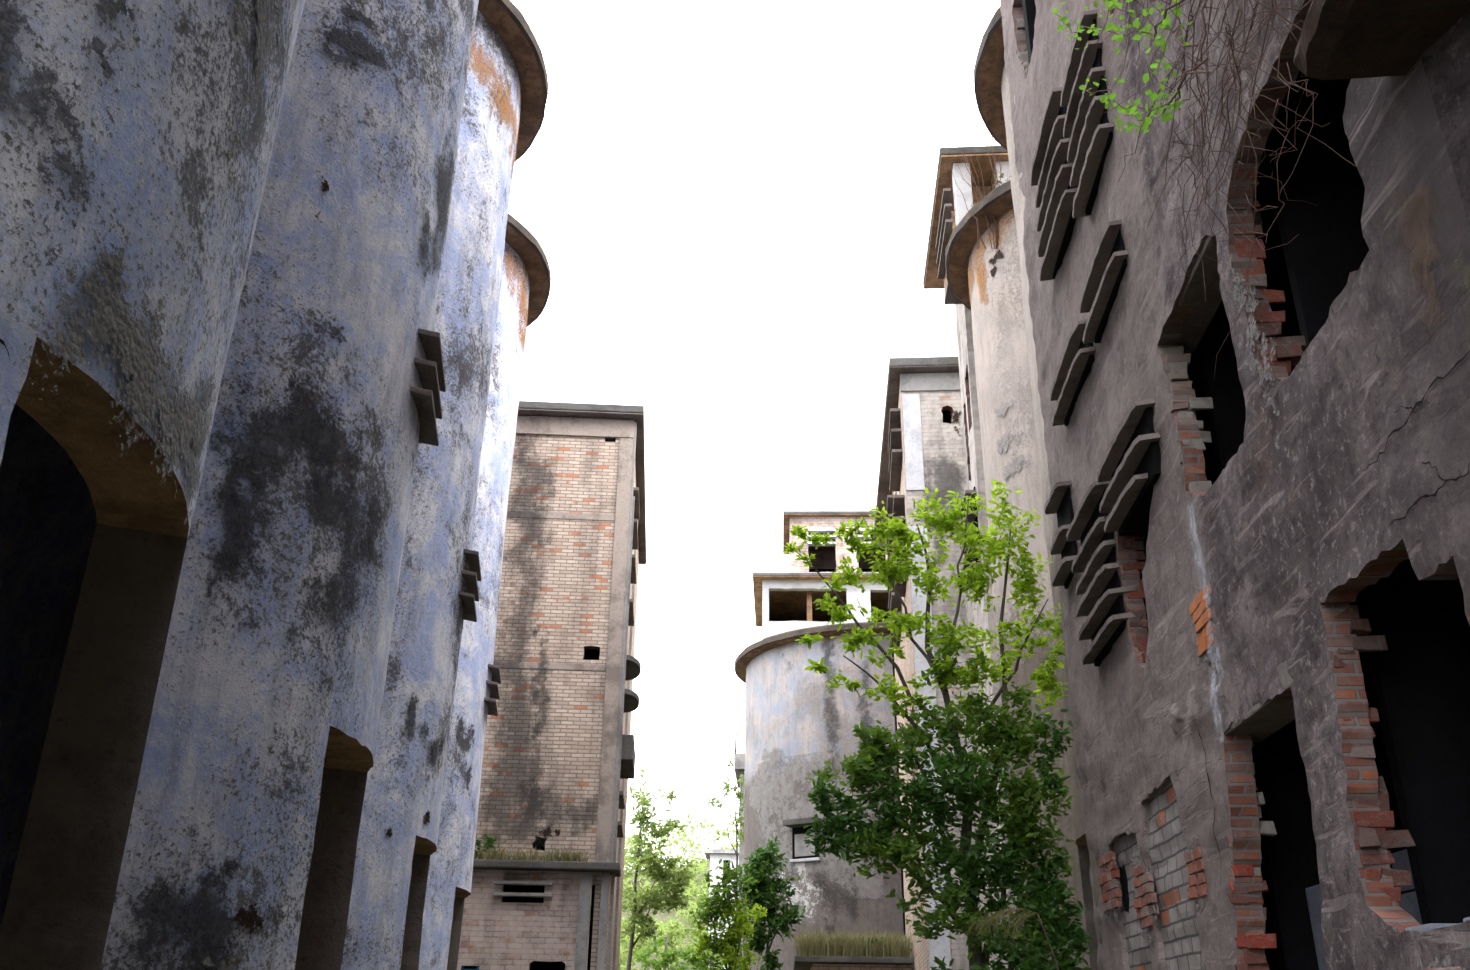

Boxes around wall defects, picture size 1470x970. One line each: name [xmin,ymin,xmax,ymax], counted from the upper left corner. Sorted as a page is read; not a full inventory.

spalling [1227,256,1282,417]
crack [1362,351,1470,472]
damp [205,364,382,641]
crack [1382,461,1470,533]
damp [482,435,595,841]
flaking render [1189,581,1215,665]
flaking render [1095,835,1159,948]
flaking render [1183,836,1211,913]